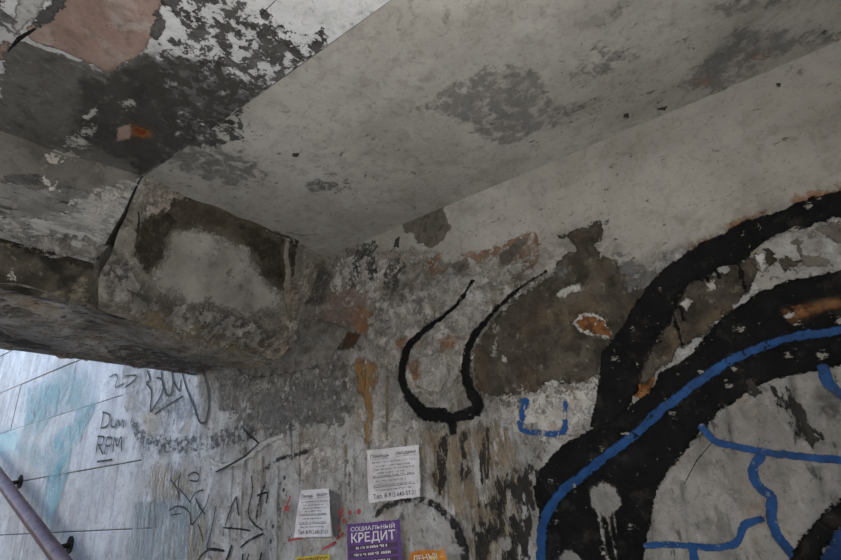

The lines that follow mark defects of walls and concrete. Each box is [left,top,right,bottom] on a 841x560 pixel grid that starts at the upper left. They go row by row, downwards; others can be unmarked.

crack [7,28,36,52]
peeling [417,65,603,145]
damp [108,197,299,347]
rust [353,358,389,445]
spalling [98,207,664,480]
damp [420,418,540,560]